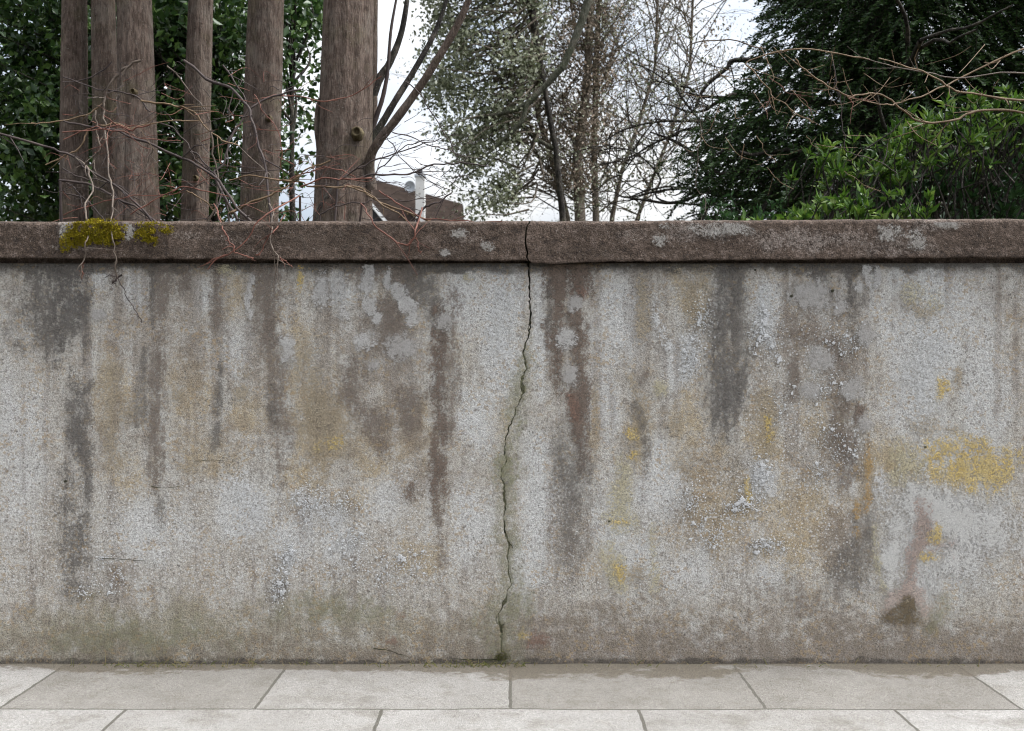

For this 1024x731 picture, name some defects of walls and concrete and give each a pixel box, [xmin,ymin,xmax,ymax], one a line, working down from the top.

water stain [20,264,96,608]
water stain [129,264,191,531]
water stain [208,265,225,332]
water stain [209,364,224,450]
water stain [247,264,298,485]
water stain [322,264,467,586]
crack [455,221,532,661]
water stain [700,264,755,447]
water stain [784,264,863,403]
water stain [819,393,867,490]
water stain [754,489,877,624]